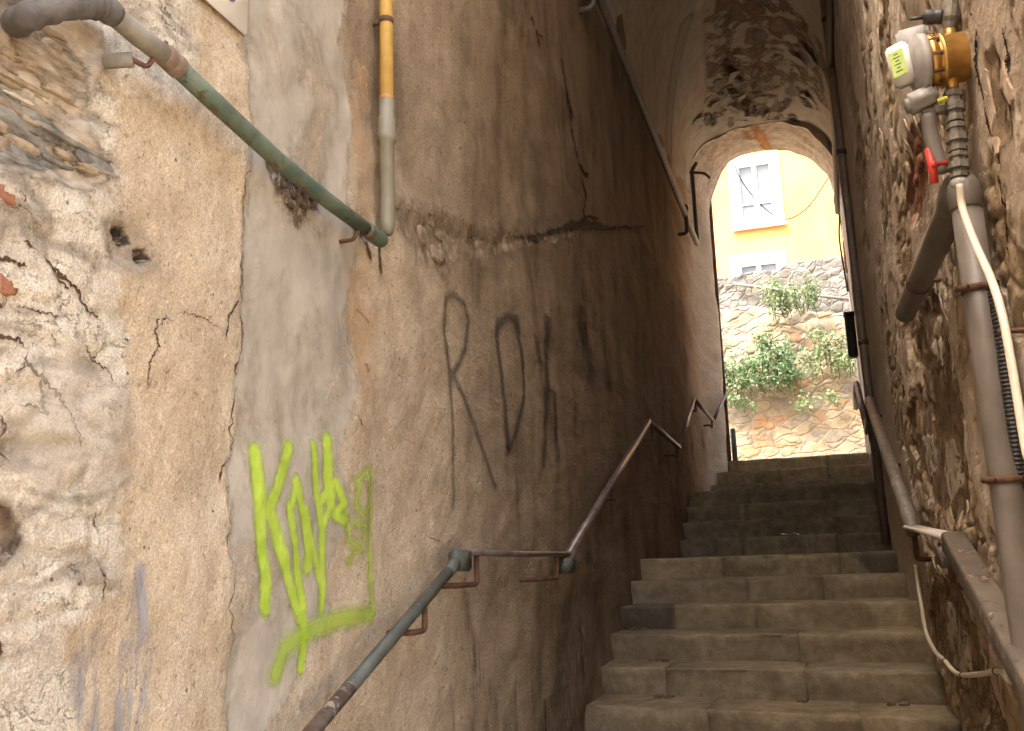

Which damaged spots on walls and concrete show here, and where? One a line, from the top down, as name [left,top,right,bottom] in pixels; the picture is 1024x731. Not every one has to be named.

spalling [0,0,119,191]
crack [516,59,644,255]
peeling [693,0,829,128]
crack [0,333,82,462]
crack [0,240,101,321]
crack [86,345,113,381]
spalling [106,219,151,271]
crack [148,170,251,503]
spalling [397,200,578,278]
crack [227,532,237,649]